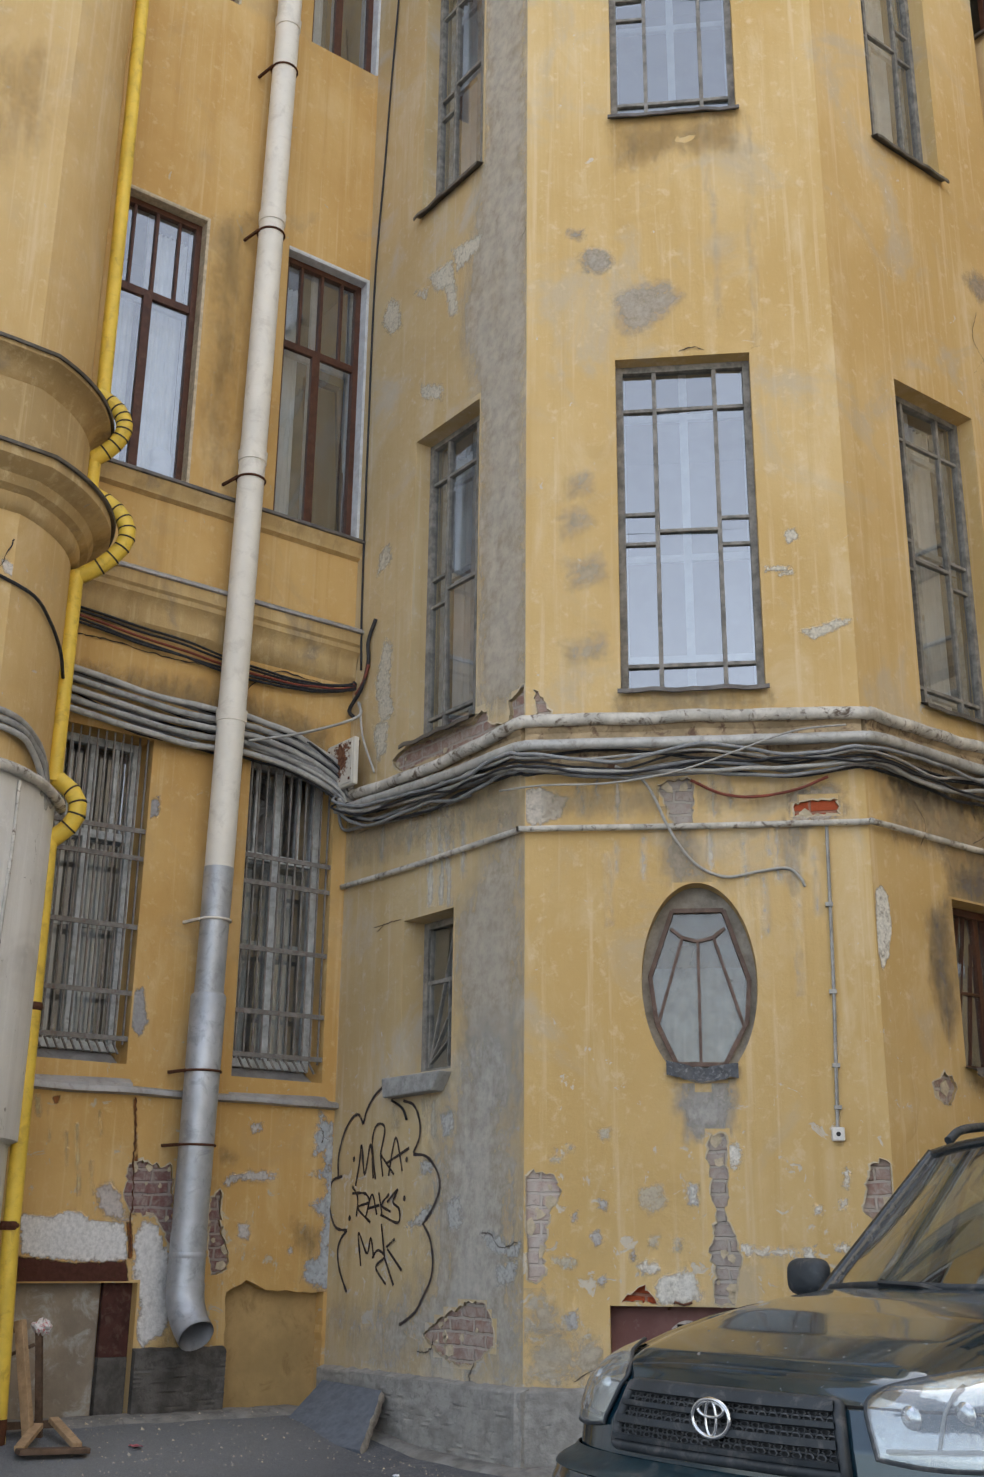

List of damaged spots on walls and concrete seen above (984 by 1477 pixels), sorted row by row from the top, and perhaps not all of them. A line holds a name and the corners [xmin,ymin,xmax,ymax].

peeling [416,233,482,317]
spalling [374,638,553,772]
spalling [931,1069,958,1106]
spalling [96,1157,175,1251]
spalling [207,1171,276,1275]
spalling [482,1148,576,1286]
spalling [621,1131,816,1308]
spalling [841,1157,894,1219]
spalling [422,1300,495,1369]